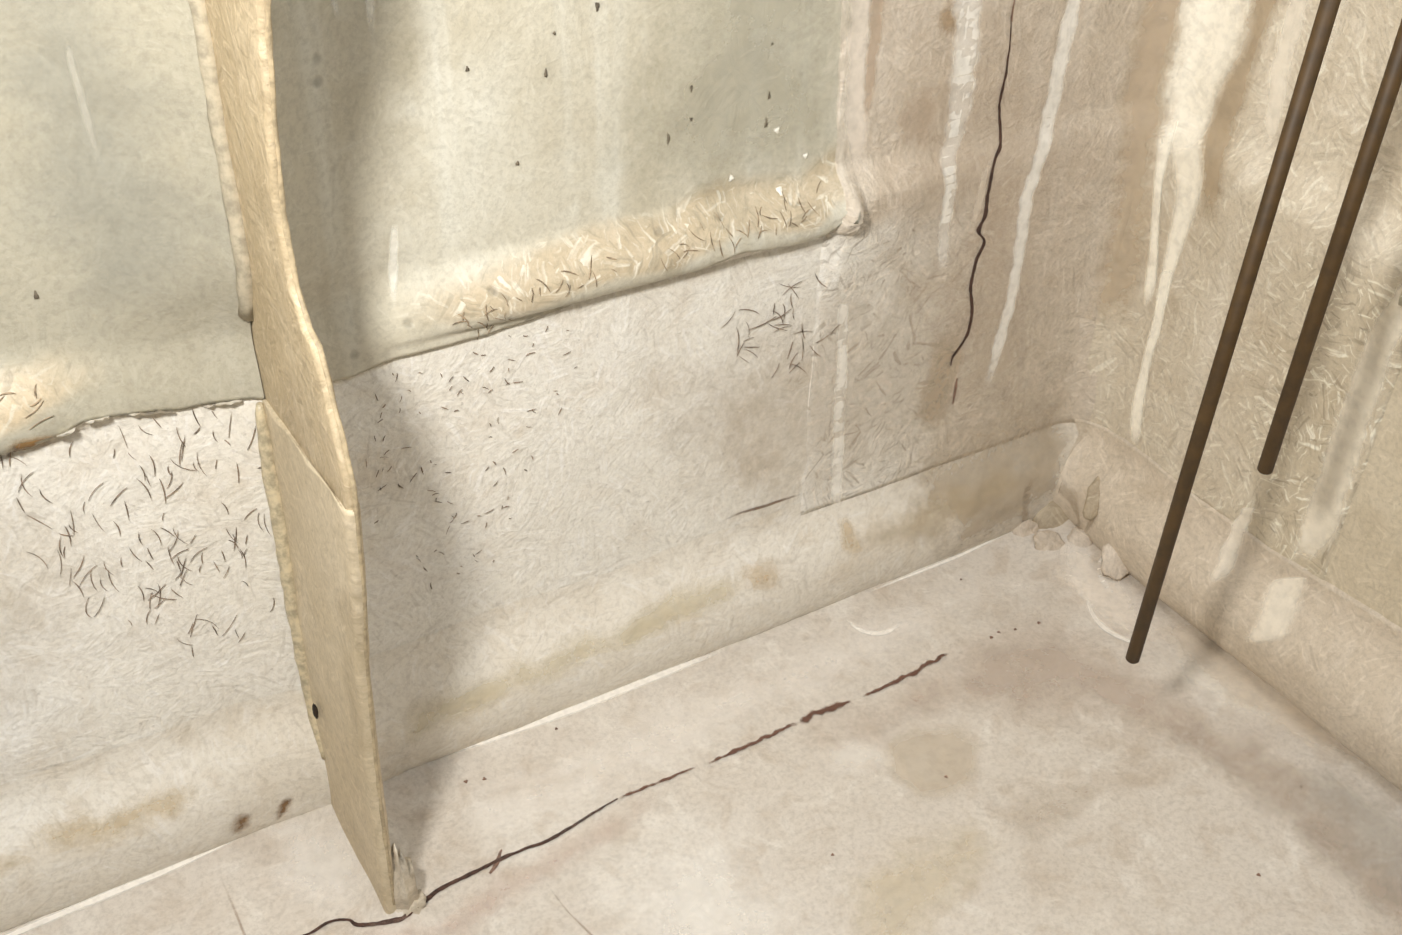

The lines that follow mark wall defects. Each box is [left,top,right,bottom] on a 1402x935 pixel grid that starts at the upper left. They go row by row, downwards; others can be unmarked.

leakage [940,0,978,252]
crack [951,0,1015,404]
leakage [994,0,1078,359]
crack [303,654,945,935]